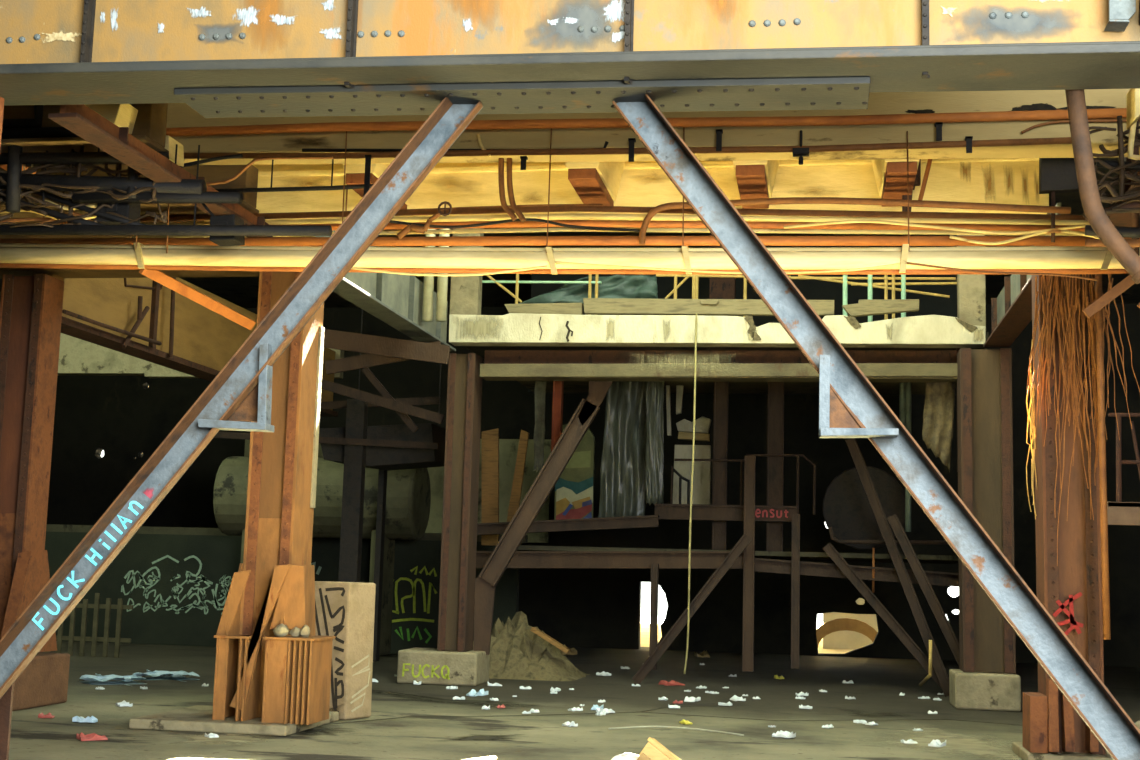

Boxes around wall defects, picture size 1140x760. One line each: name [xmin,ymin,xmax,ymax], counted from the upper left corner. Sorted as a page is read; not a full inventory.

peeling [100,9,118,30]
peeling [188,7,211,17]
peeling [237,7,258,26]
peeling [271,15,295,25]
damp [532,0,611,44]
damp [966,8,1069,37]
peeling [42,31,82,42]
peeling [320,28,342,39]